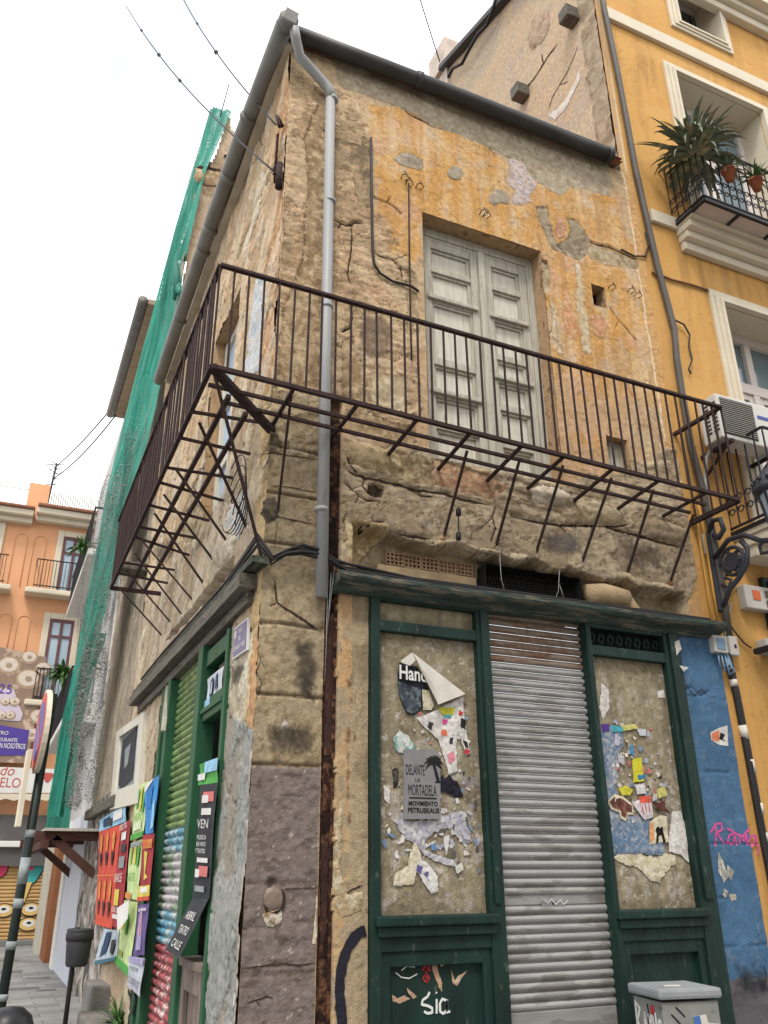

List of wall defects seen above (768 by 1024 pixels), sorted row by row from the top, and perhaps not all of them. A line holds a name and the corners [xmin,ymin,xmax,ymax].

peeling [334,58,640,269]
crack [335,220,406,284]
spalling [432,458,509,499]
crack [344,457,680,547]
crack [270,578,321,632]
spalling [344,517,389,568]
spalling [428,539,569,575]
spalling [608,572,673,600]
rust [323,613,334,779]
rust [320,840,329,943]